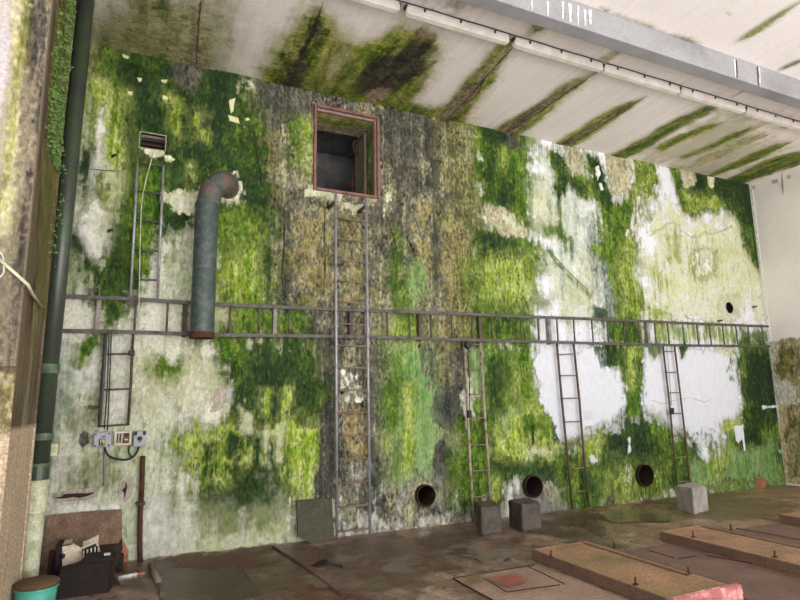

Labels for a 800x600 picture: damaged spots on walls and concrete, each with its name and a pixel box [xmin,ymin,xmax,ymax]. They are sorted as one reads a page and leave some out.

damp [657,123,721,151]
damp [681,127,767,167]
peeling [626,191,647,236]
peeling [692,246,719,280]
flaking render [45,474,134,516]
damp [314,400,341,510]
damp [340,369,364,403]
damp [344,438,403,536]
damp [402,382,417,473]
damp [414,380,475,528]
peeling [533,344,627,443]
peeling [640,342,741,453]